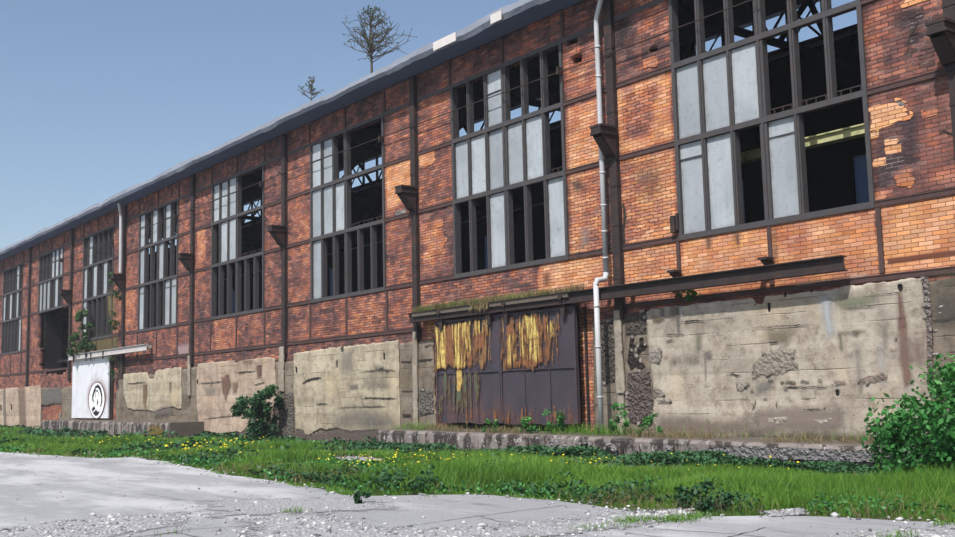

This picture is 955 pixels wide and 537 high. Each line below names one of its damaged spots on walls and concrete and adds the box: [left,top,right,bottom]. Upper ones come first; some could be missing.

peeling [900,0,927,8]
peeling [868,98,938,167]
peeling [895,173,915,188]
spalling [600,310,653,425]